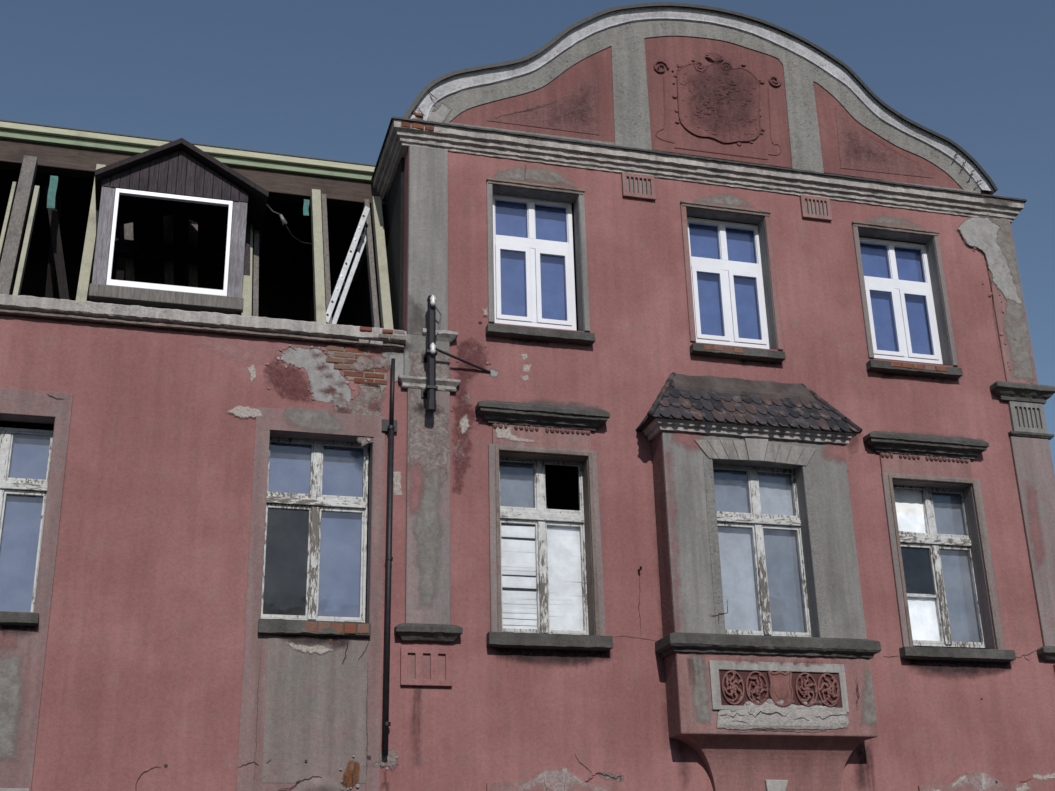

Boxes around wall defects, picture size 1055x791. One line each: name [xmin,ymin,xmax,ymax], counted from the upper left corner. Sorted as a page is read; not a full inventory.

peeling [958,215,1035,384]
peeling [230,406,262,418]
peeling [248,343,407,416]
peeling [393,341,491,496]
crack [544,757,621,790]